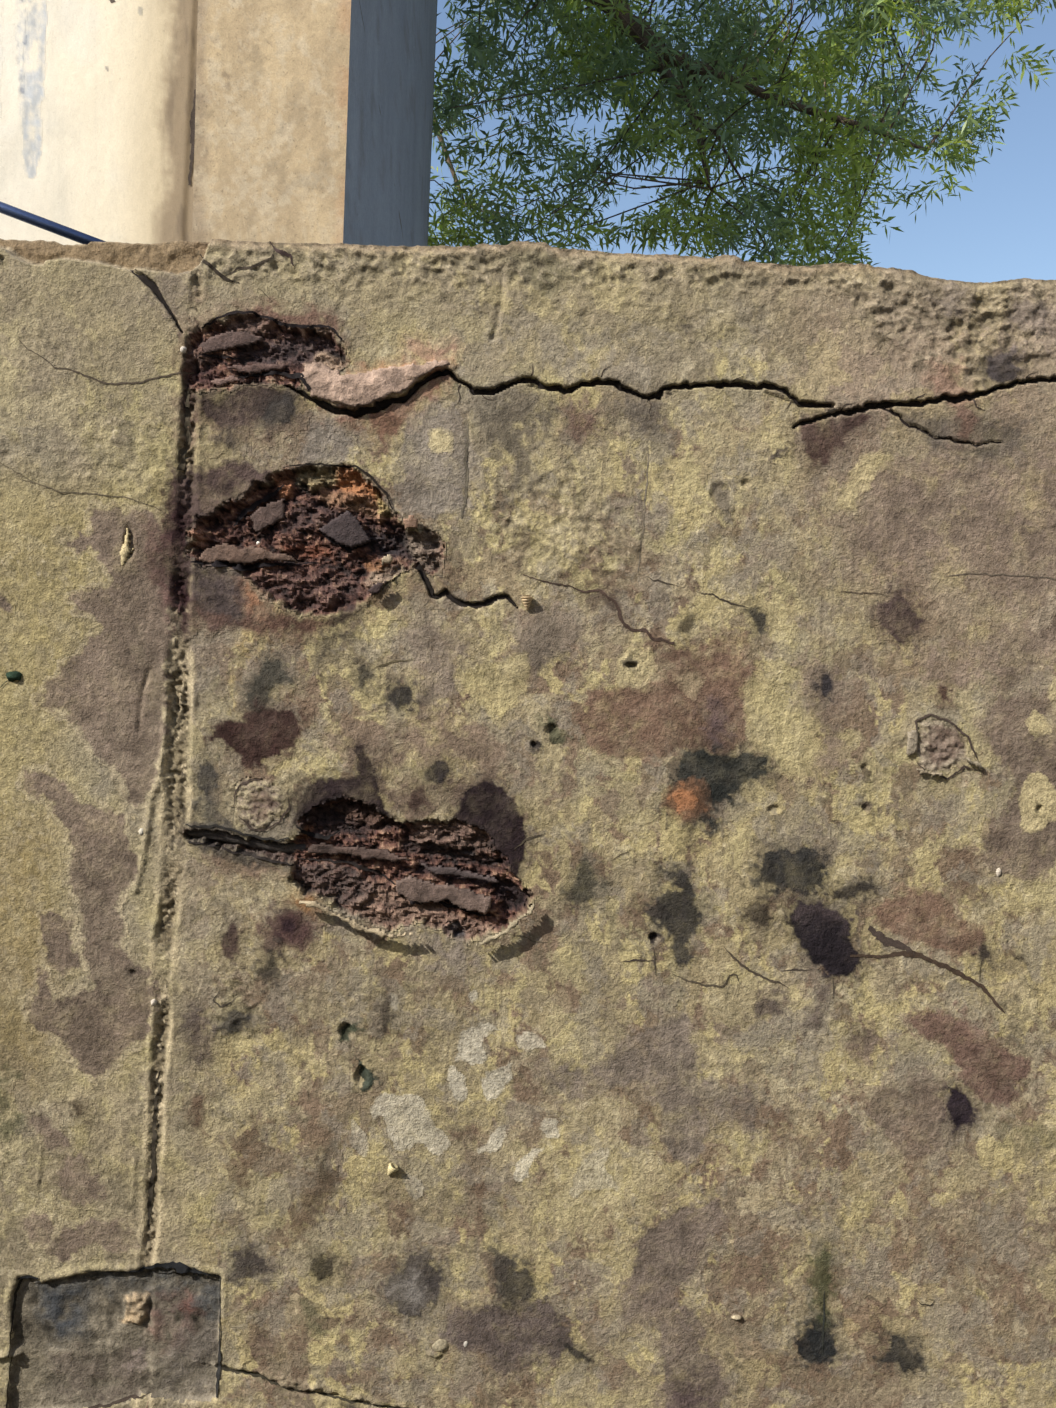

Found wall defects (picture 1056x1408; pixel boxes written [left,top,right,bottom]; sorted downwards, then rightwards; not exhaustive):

crack [129,269,183,333]
spalling [181,310,450,410]
rust [121,285,462,657]
spalling [185,463,446,619]
crack [416,563,674,644]
crack [286,364,1056,519]
water stain [833,279,1056,890]
rust [192,688,315,779]
spalling [182,776,538,946]
rust [280,729,538,884]
water stain [236,568,874,987]
water stain [732,831,1037,1171]